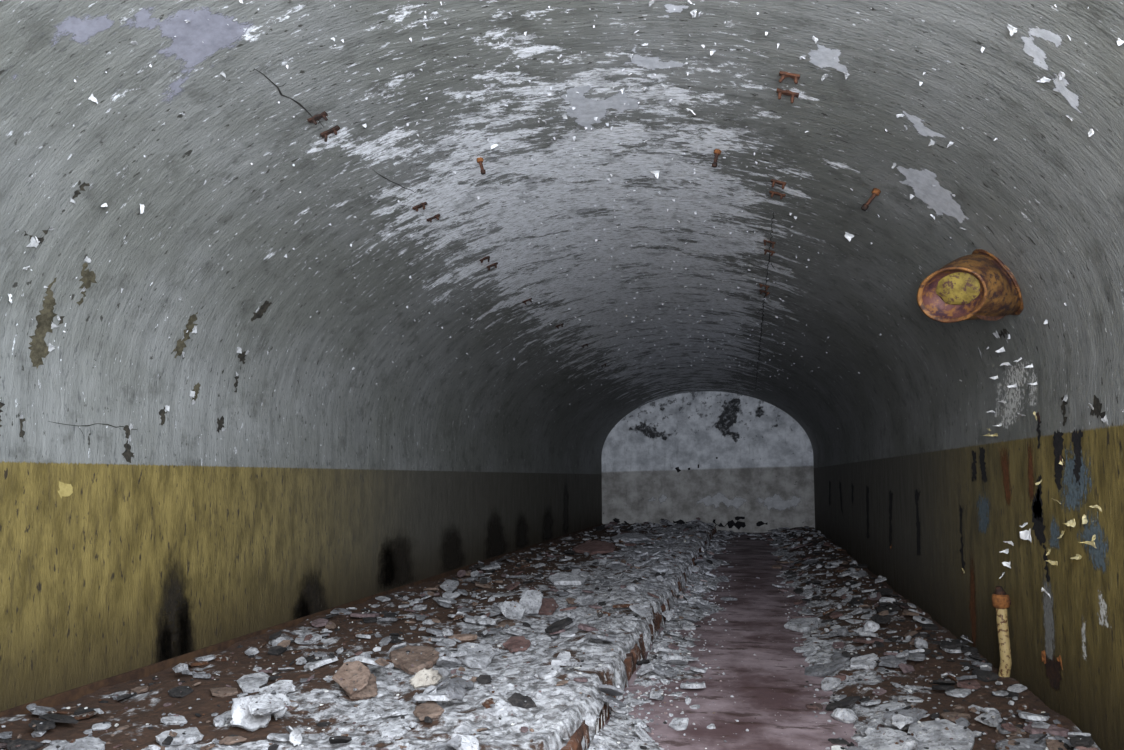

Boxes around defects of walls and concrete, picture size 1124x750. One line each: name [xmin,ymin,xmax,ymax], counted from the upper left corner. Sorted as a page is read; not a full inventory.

crack [254,68,324,127]
peeling [1007,24,1083,121]
peeling [883,160,969,238]
peeling [76,256,97,306]
peeling [529,140,803,385]
peeling [28,277,65,368]
peeling [987,329,1037,388]
peeling [1088,395,1108,424]
peeling [1046,446,1109,571]
peeling [1000,523,1031,578]
damp [157,565,194,662]
damp [294,575,327,619]